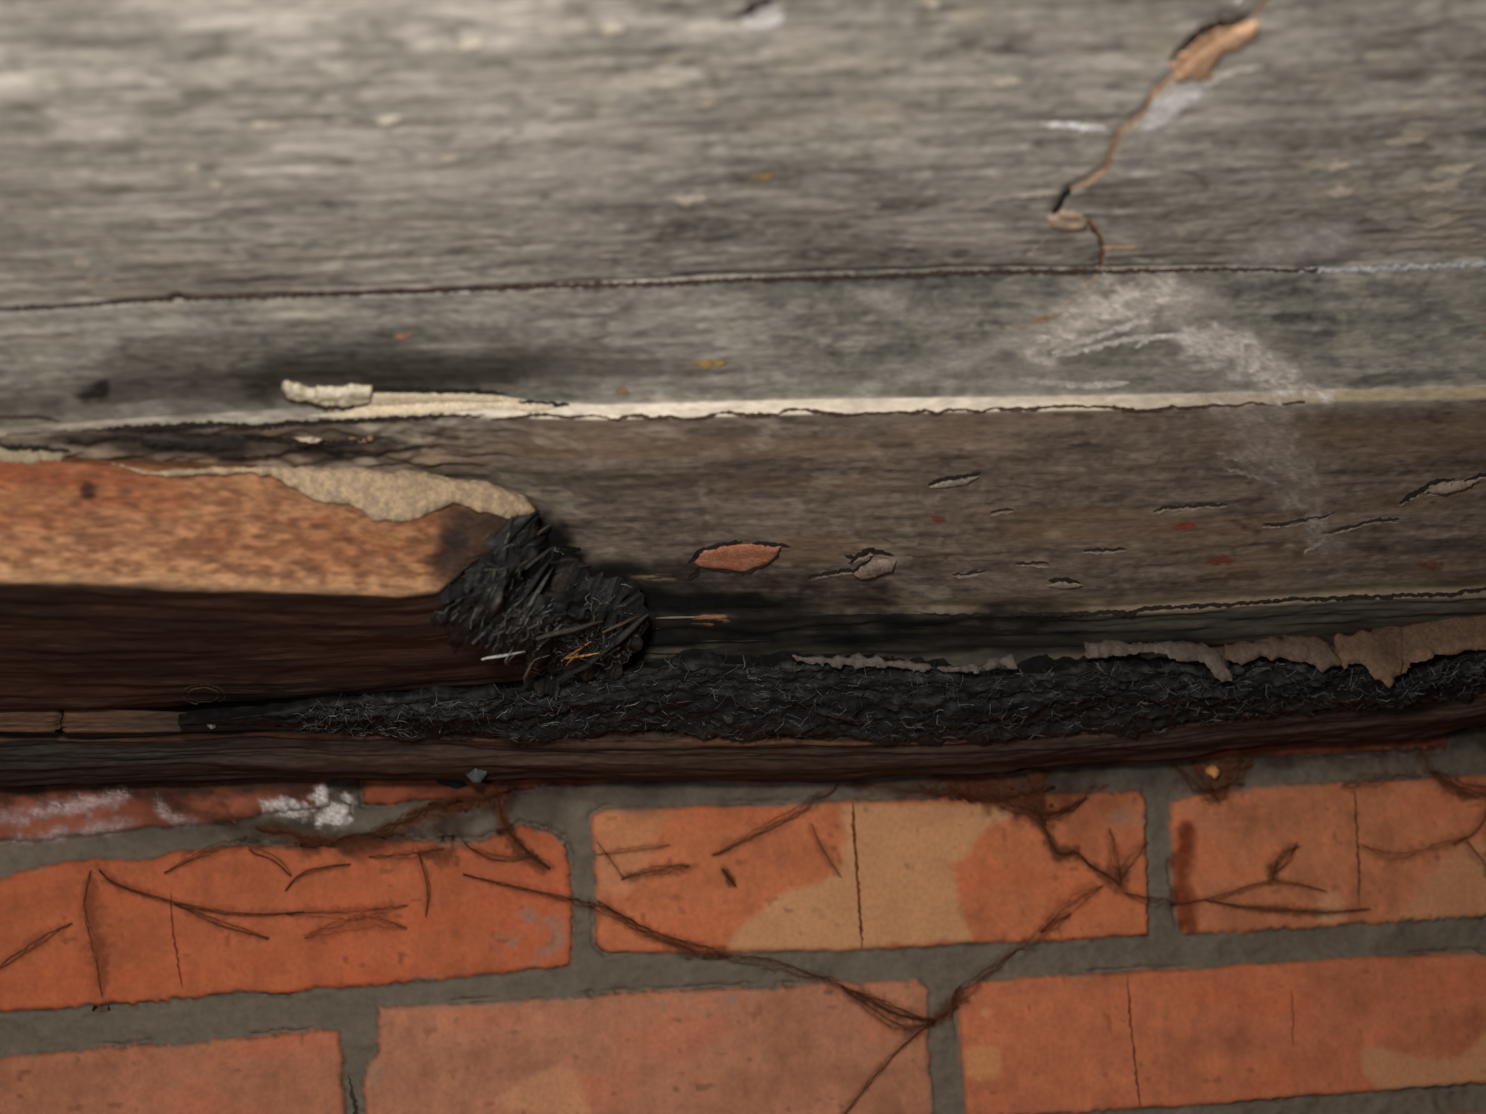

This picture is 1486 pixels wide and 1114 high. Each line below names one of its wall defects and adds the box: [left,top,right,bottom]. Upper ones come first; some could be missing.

crack [0,0,1318,329]
crack [0,400,1305,432]
crack [1153,502,1227,515]
crack [1262,473,1486,536]
spalling [636,539,791,581]
spalling [695,614,728,625]
peeling [792,652,1018,674]
peeling [1084,614,1486,688]
water stain [0,778,361,842]
crack [851,801,863,948]
crack [170,892,183,989]
crack [1127,975,1141,1106]